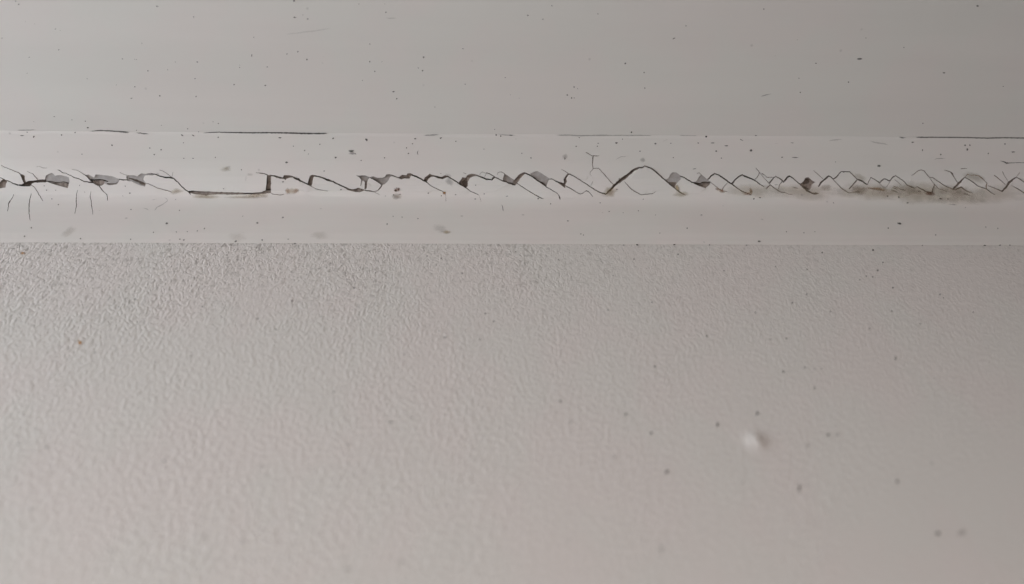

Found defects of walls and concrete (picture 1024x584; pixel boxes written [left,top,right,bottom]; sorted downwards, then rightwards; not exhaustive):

crack [0,166,108,218]
crack [143,152,1024,200]